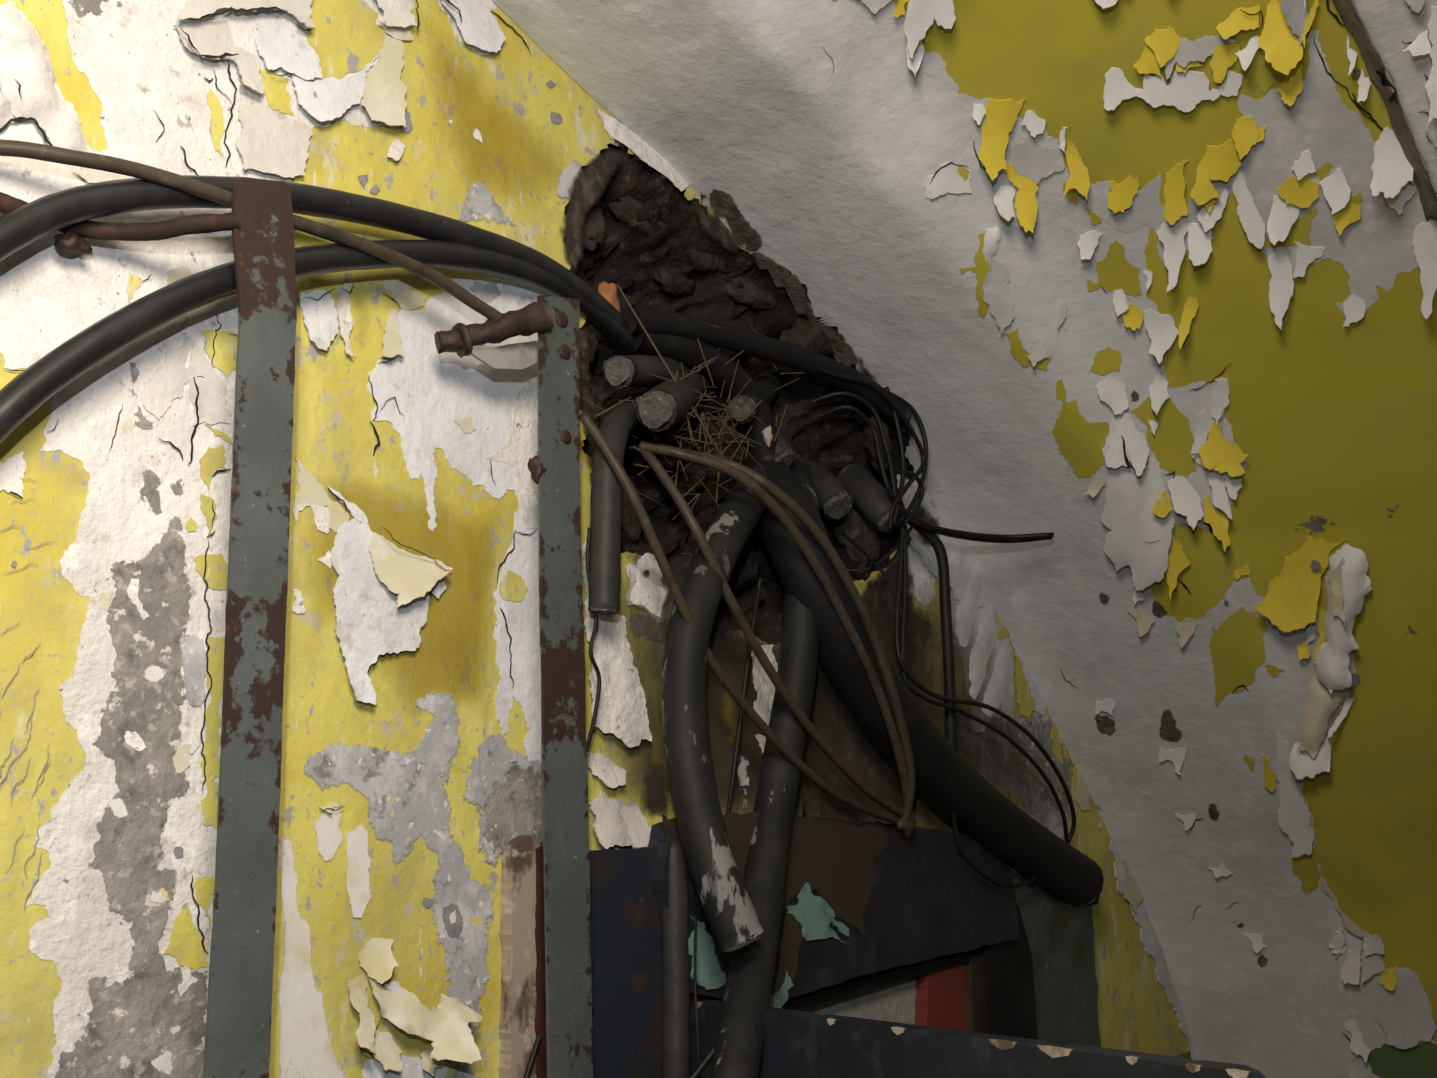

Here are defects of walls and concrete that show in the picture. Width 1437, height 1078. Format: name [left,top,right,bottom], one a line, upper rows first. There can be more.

peeling [0,231,234,371]
peeling [91,208,232,223]
peeling [0,0,420,203]
peeling [438,0,531,56]
spalling [579,320,653,483]
spalling [556,109,873,380]
peeling [861,0,956,78]
peeling [924,0,1437,648]
peeling [0,294,238,1078]
peeling [278,277,554,1078]
spalling [582,347,1202,1073]
peeling [1208,515,1437,1049]